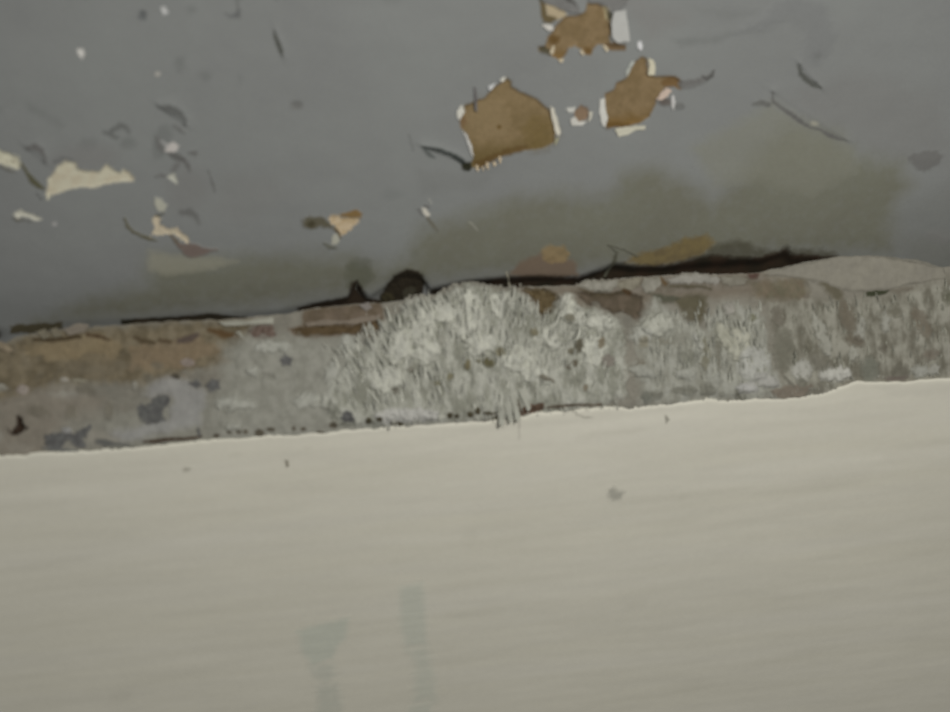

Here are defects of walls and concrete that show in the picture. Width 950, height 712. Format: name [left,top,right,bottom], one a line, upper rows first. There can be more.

peeling [457,0,716,173]
peeling [0,149,136,202]
peeling [11,208,59,228]
peeling [300,208,364,250]
water stain [18,94,950,441]
flaking render [520,286,558,313]
peeling [571,272,813,322]
flaking render [0,302,386,438]
spalling [768,375,824,399]
spalling [365,416,405,426]
spalling [447,406,499,420]
water stain [293,614,353,712]